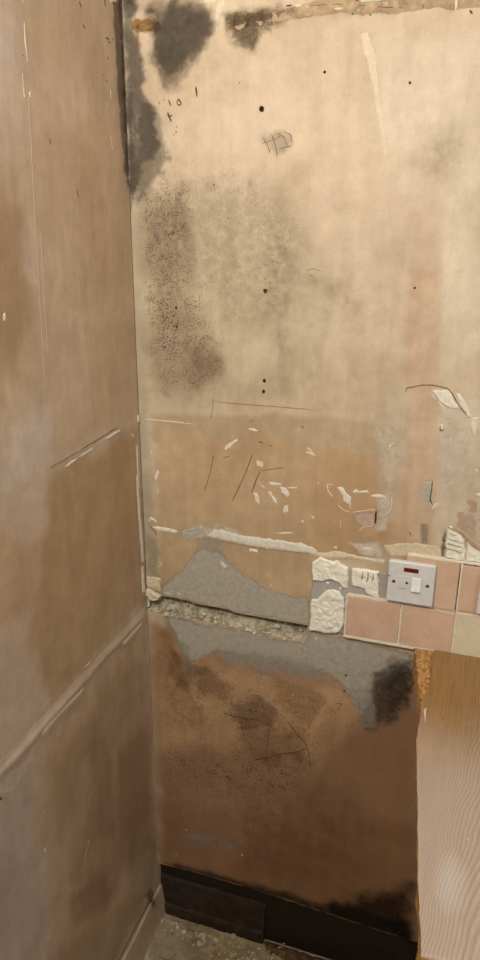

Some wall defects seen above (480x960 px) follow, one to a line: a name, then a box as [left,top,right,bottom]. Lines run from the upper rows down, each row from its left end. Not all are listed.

spalling [195,0,480,32]
damp [103,0,209,192]
peeling [406,384,479,443]
peeling [318,482,392,531]
spalling [136,445,309,645]
damp [363,664,410,726]
damp [175,854,410,940]